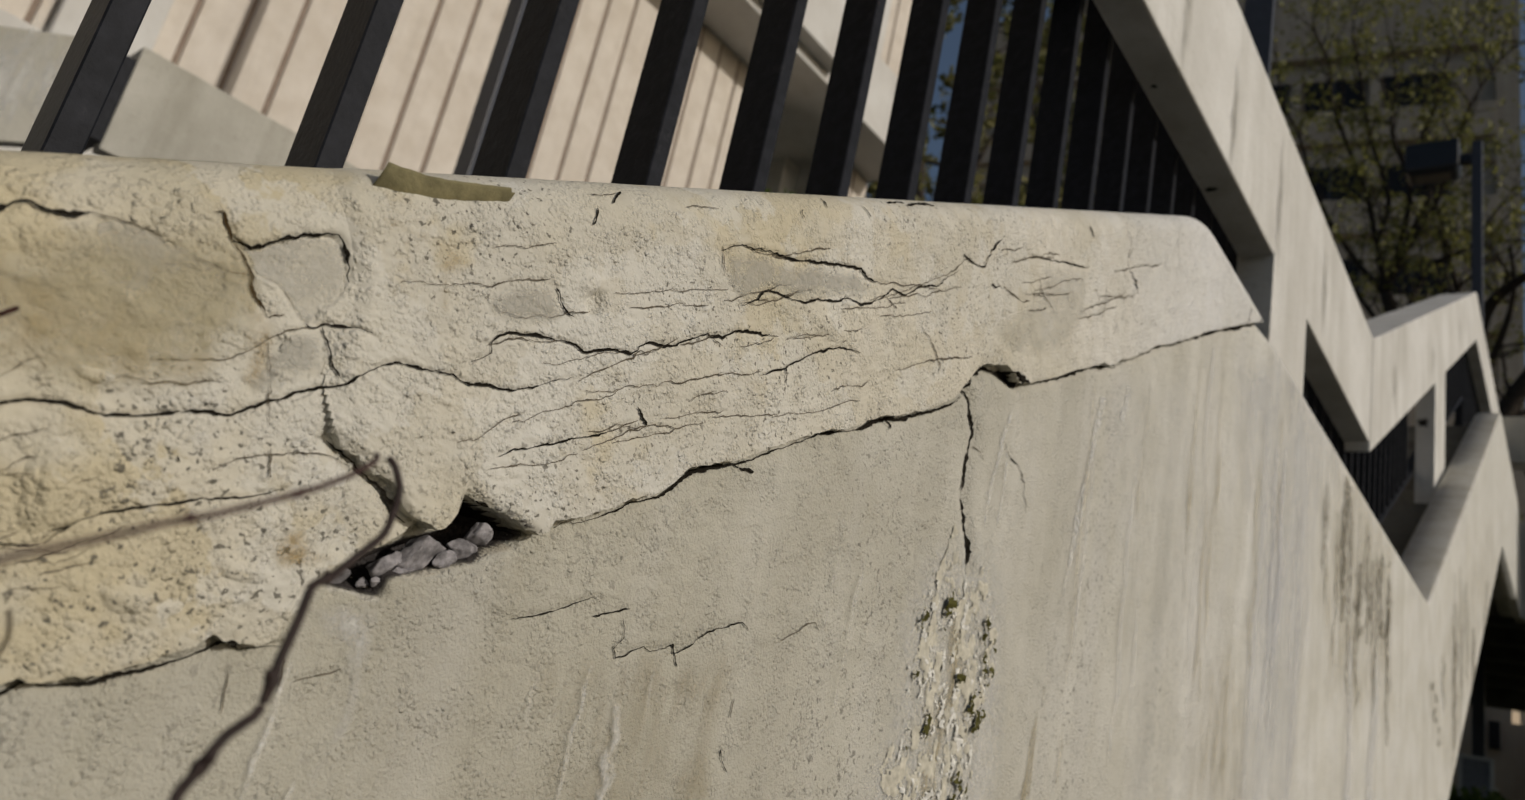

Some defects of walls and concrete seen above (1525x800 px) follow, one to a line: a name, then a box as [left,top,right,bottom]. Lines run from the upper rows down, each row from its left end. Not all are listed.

crack [591,191,621,225]
crack [0,199,1255,590]
water stain [1322,478,1392,800]